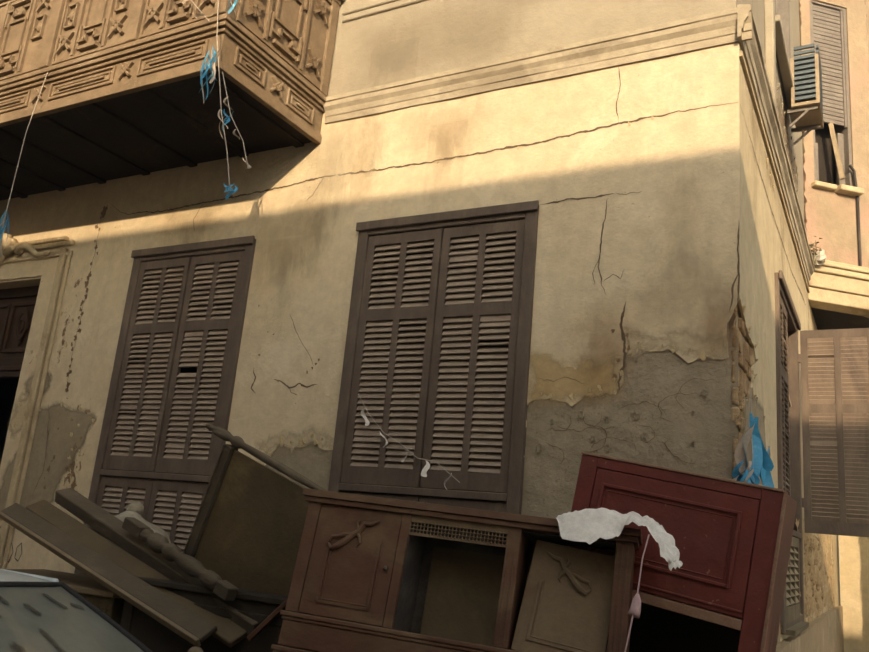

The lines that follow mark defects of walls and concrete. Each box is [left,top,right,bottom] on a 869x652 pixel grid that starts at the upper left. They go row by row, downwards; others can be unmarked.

flaking render [776,76,800,200]
crack [119,67,809,323]
spalling [55,205,108,392]
crack [251,318,320,395]
crack [611,302,630,393]
spalling [62,404,90,490]
peeling [265,439,333,491]
peeling [521,305,759,519]
spalling [795,518,835,624]